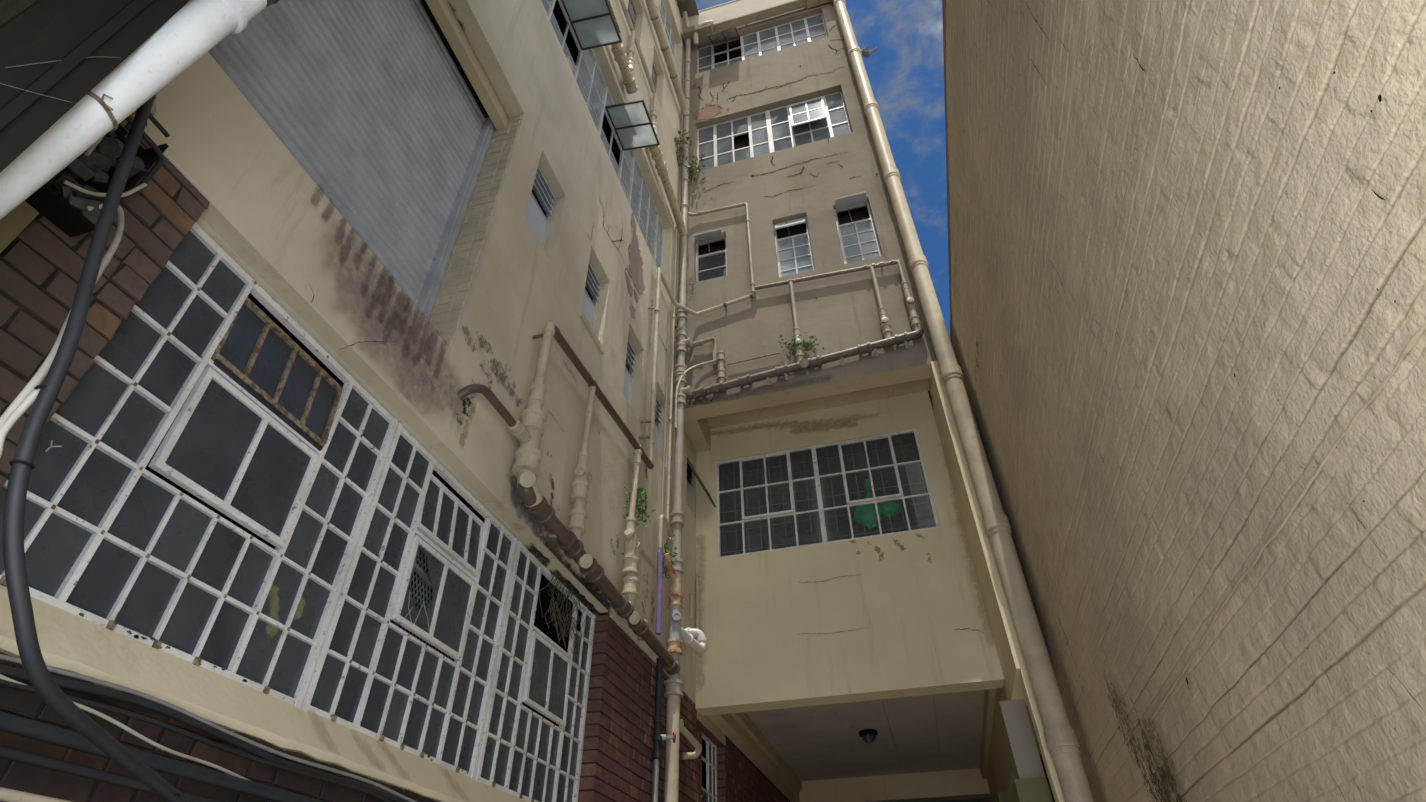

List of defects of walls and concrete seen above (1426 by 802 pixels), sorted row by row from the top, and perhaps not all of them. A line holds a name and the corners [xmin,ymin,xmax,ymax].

crack [705,138,860,197]
water stain [331,244,522,425]
water stain [1105,678,1187,802]